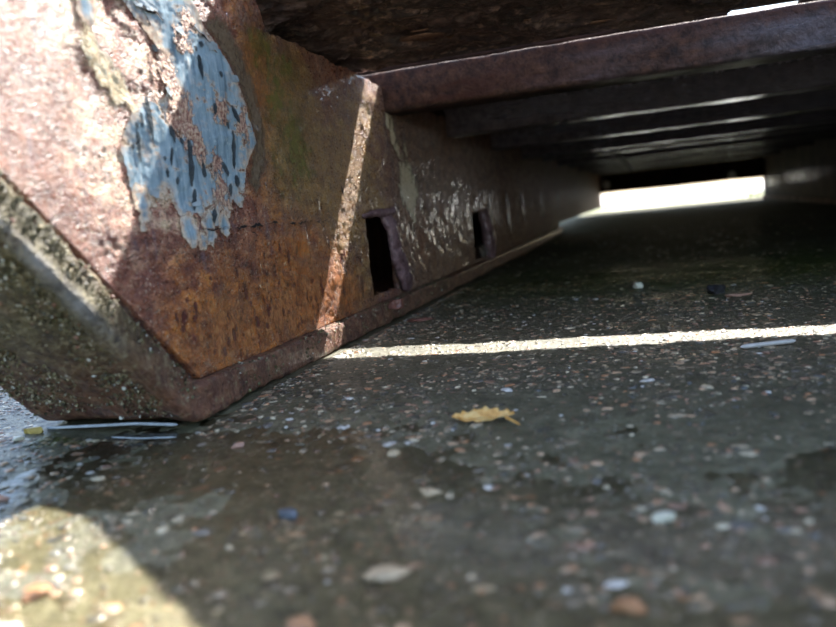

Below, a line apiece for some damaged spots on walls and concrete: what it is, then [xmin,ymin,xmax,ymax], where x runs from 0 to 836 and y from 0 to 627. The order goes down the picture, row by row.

peeling [76,0,256,250]
rust [199,237,360,357]